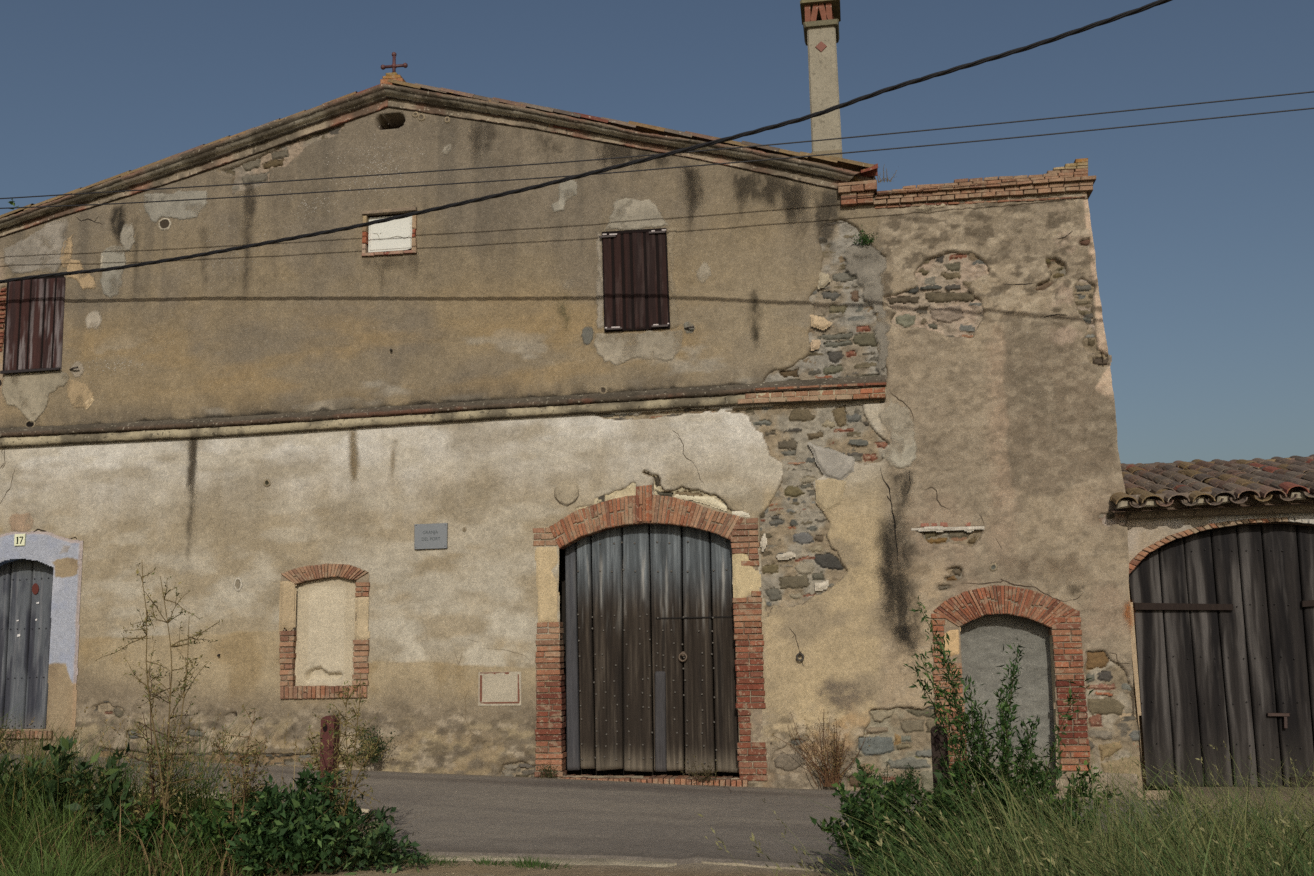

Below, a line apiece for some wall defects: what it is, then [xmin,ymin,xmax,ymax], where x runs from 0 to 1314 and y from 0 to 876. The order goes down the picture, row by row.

peeling [144,191,207,230]
leakage [734,174,802,215]
peeling [59,225,135,297]
peeling [86,311,101,328]
spalling [764,220,989,382]
spalling [1036,259,1112,367]
peeling [67,361,94,409]
spalling [576,399,917,617]
leakage [882,525,917,647]
spalling [773,735,808,775]
spalling [847,706,937,793]